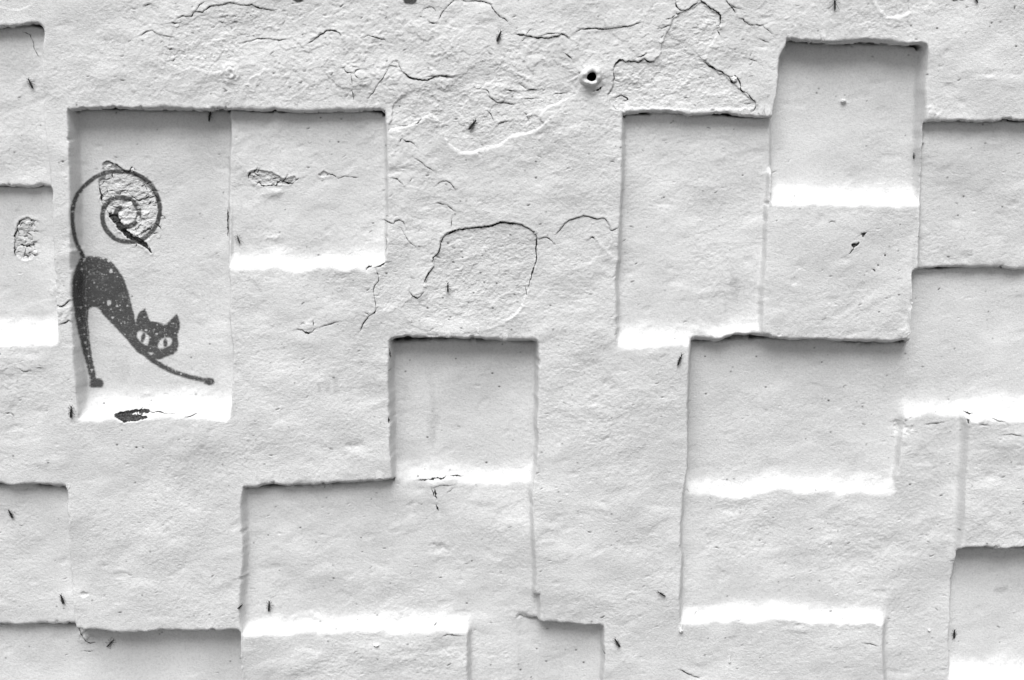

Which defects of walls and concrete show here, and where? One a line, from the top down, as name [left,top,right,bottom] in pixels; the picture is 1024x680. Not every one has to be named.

crack [143,1,339,61]
crack [344,35,450,100]
crack [420,0,769,111]
crack [485,86,562,124]
flaking render [14,217,39,260]
flaking render [99,161,165,253]
flaking render [248,169,299,187]
crack [394,121,455,224]
crack [543,215,617,242]
crack [361,220,413,328]